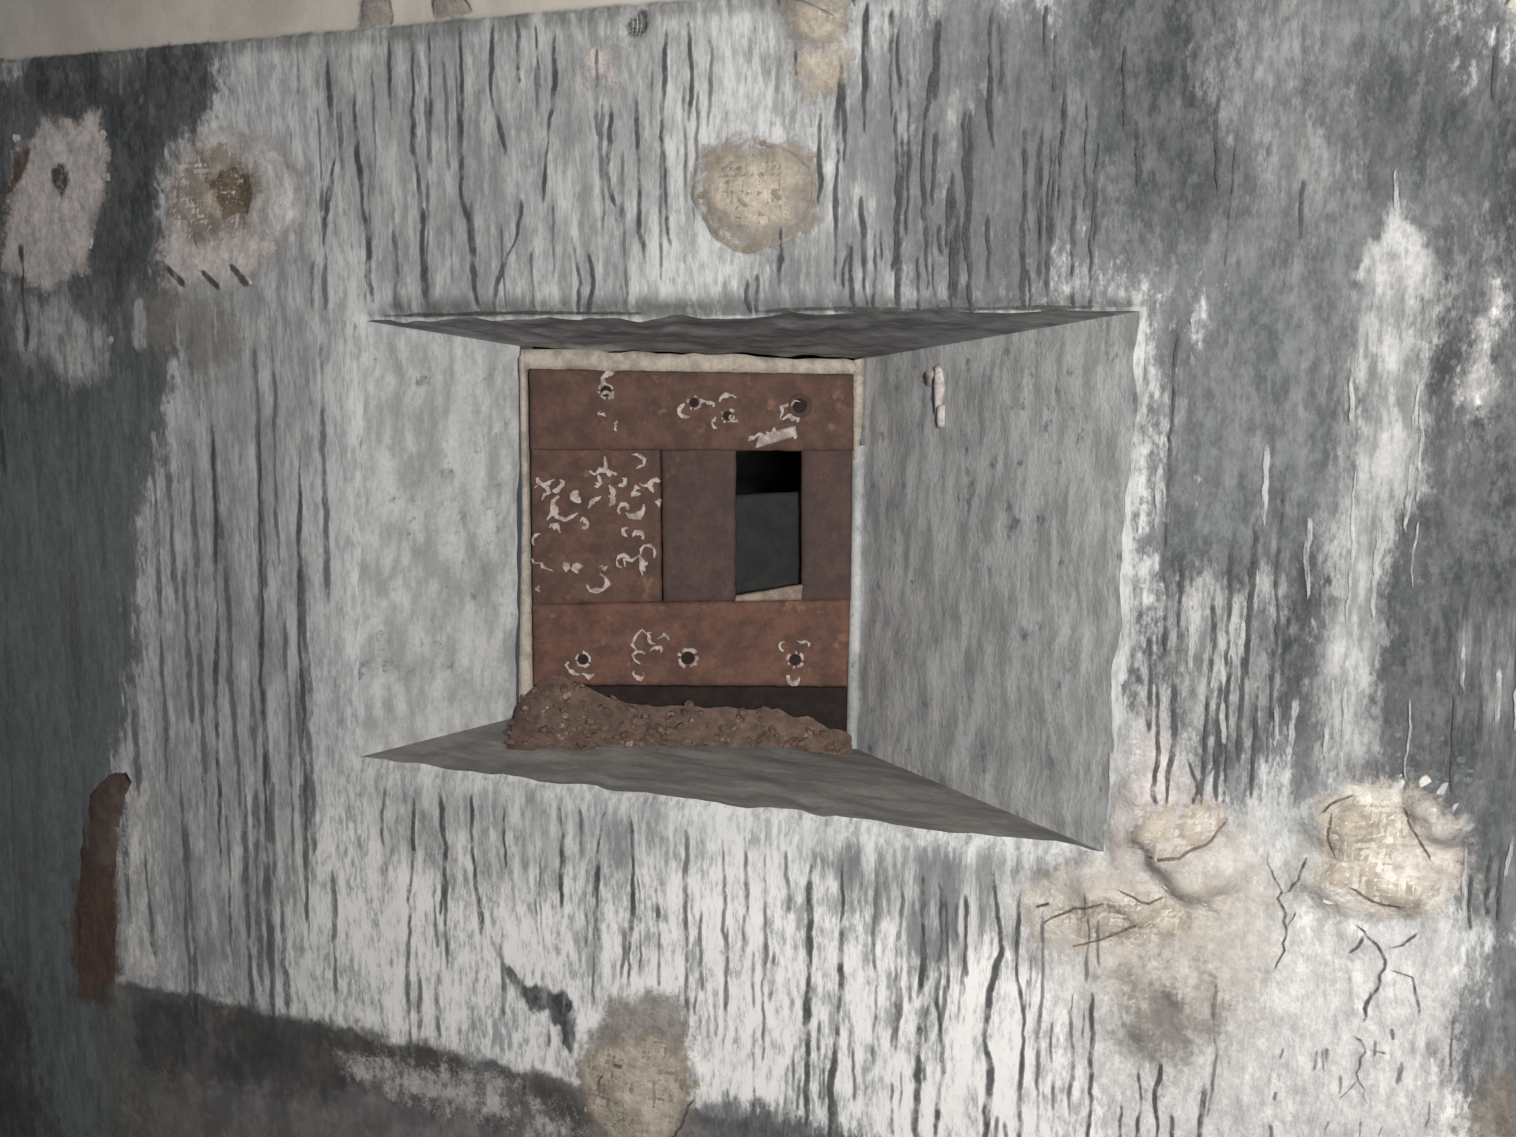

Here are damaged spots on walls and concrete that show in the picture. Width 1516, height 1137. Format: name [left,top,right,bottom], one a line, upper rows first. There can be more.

peeling [1,110,113,387]
peeling [132,298,147,350]
spalling [154,127,305,342]
damp [410,27,524,309]
damp [595,23,714,302]
spalling [692,139,819,253]
damp [0,42,317,1137]
damp [722,0,1516,1137]
corrosion [69,866,123,1003]
spalling [505,964,701,1137]
damp [683,830,776,1068]
crack [1341,926,1421,1099]